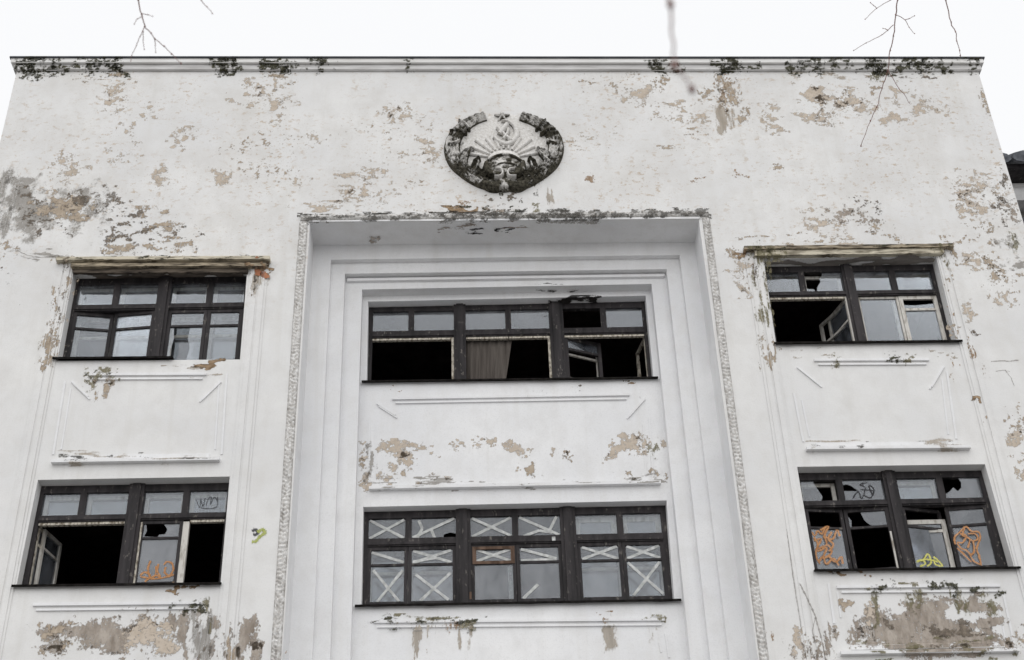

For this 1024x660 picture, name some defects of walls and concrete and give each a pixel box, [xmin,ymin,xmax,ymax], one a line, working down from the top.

peeling [791,75,950,127]
peeling [211,71,313,208]
peeling [291,102,451,213]
peeling [95,184,205,256]
peeling [786,195,900,245]
peeling [939,164,1024,310]
peeling [358,438,452,492]
peeling [448,436,535,478]
peeling [603,432,668,480]
peeling [31,608,182,660]
peeling [203,614,265,660]
peeling [766,592,1024,660]